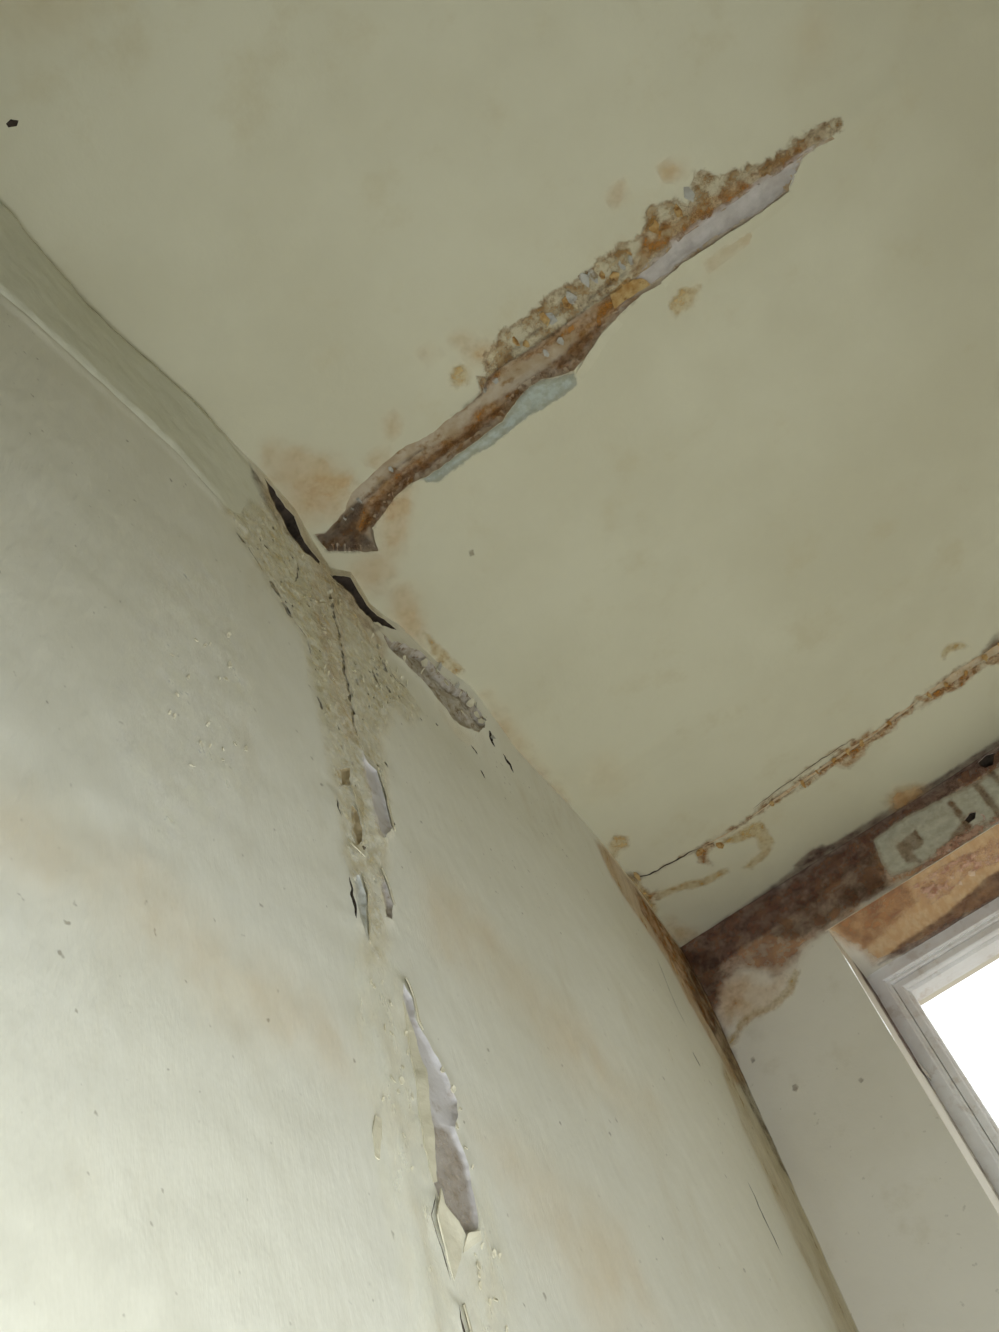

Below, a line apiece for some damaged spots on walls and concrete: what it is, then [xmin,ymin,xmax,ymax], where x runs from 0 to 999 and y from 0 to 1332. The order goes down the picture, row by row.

flaking render [315,120,842,552]
crack [254,473,397,739]
flaking render [236,515,514,941]
peeling [372,978,502,1305]